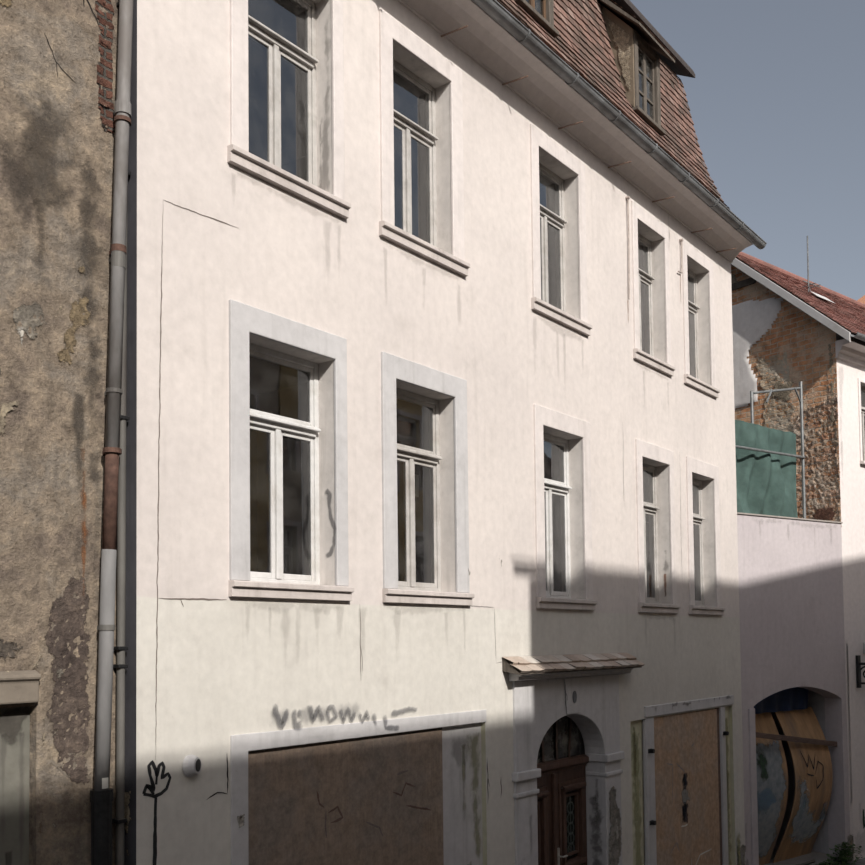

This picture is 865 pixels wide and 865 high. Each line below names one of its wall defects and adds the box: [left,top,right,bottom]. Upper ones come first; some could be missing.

flaking render [95,0,114,134]
crack [162,200,238,245]
flaking render [57,297,91,364]
peeling [0,400,19,434]
leakage [74,397,83,443]
peeling [732,297,842,527]
crack [155,267,227,732]
flaking render [45,576,91,785]
crack [208,758,228,799]
peeling [609,786,622,865]